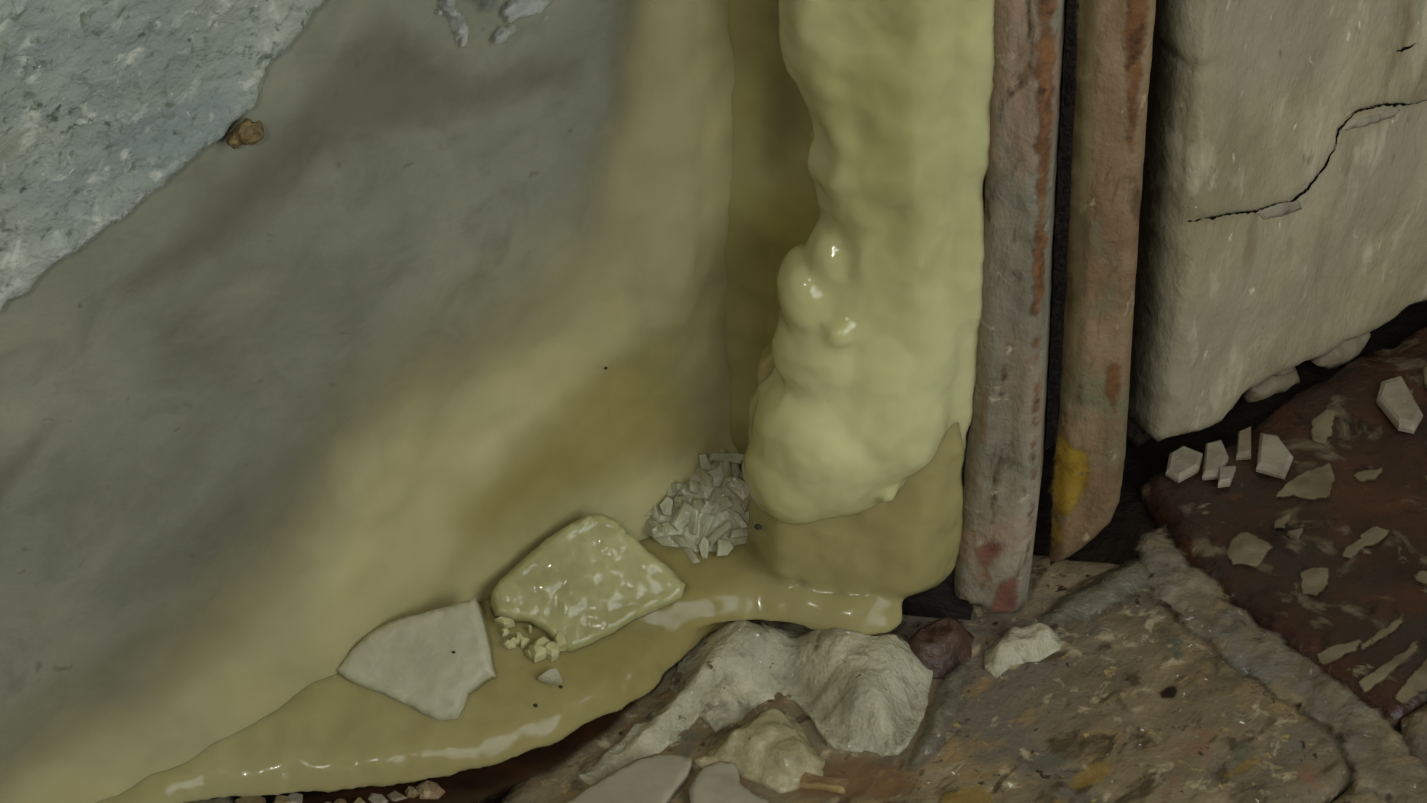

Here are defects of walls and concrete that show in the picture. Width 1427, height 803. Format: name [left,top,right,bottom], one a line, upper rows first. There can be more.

peeling [436,0,469,47]
peeling [483,0,552,44]
corrosion [1125,0,1148,143]
corrosion [1031,0,1057,315]
crack [1188,100,1426,222]
corrosion [1053,438,1090,543]